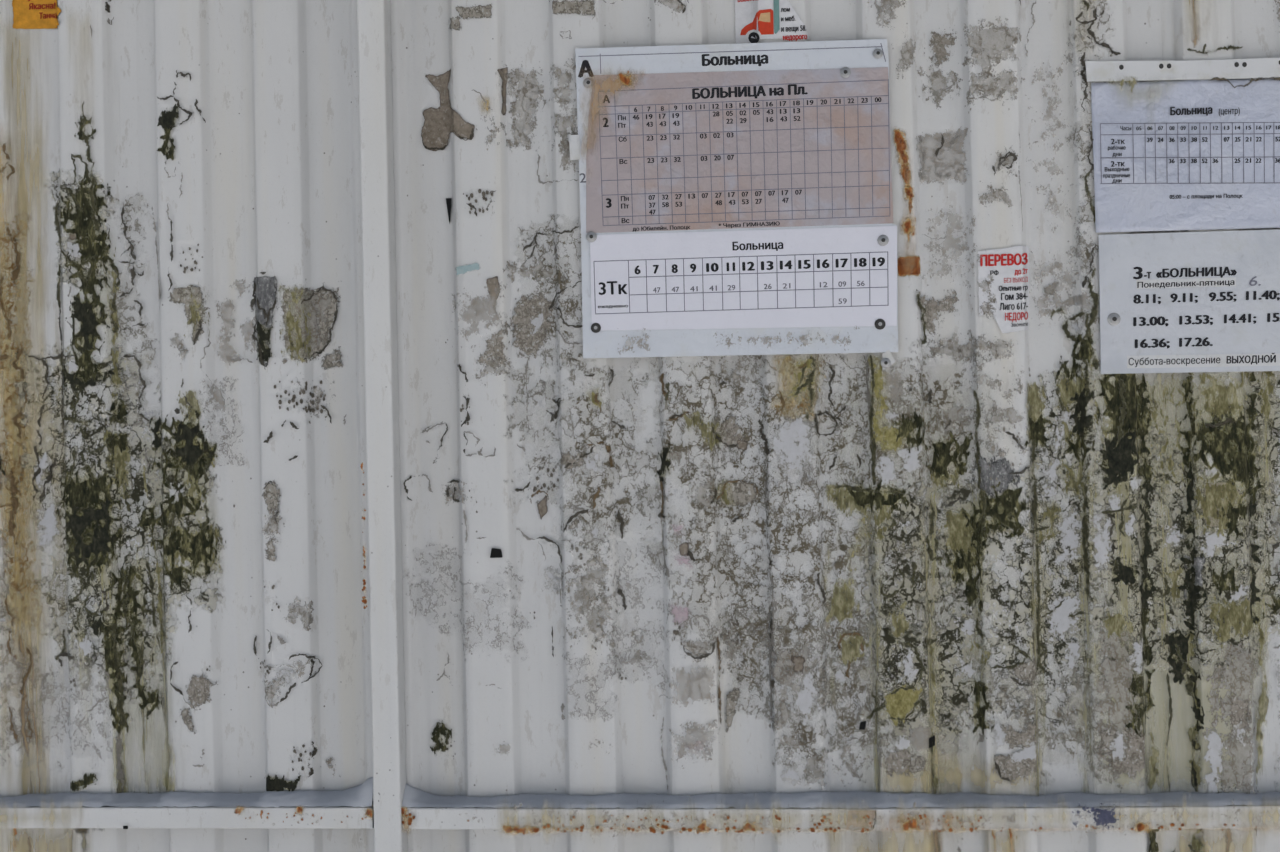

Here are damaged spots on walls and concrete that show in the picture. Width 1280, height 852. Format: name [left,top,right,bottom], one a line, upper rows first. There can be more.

peeling [421,58,579,184]
rust [894,129,920,277]
rust [0,179,46,776]
damp [108,271,122,413]
peeling [168,272,346,465]
peeling [445,259,561,519]
peeling [657,443,866,793]
damp [1136,375,1159,789]
damp [1180,376,1205,792]
damp [1246,372,1269,784]
rust [401,807,415,829]
rust [503,813,840,835]